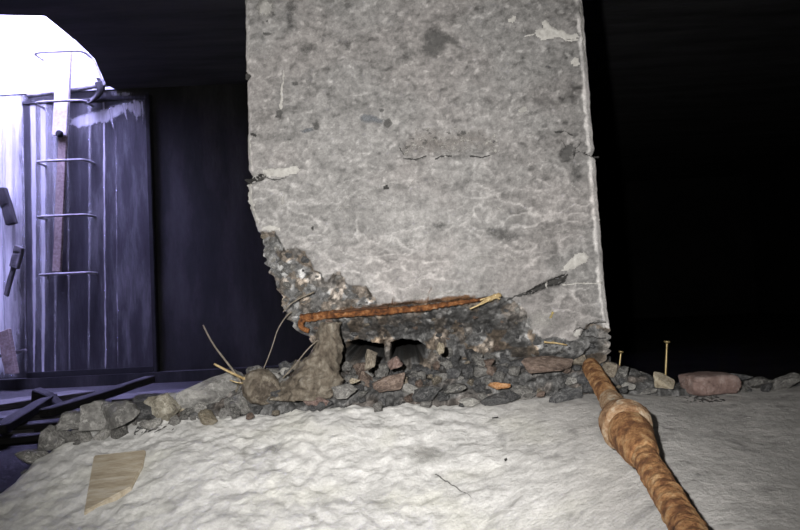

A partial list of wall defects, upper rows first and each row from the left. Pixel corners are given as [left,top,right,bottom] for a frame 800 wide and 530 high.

corrosion [330,295,475,314]
spalling [245,166,611,374]